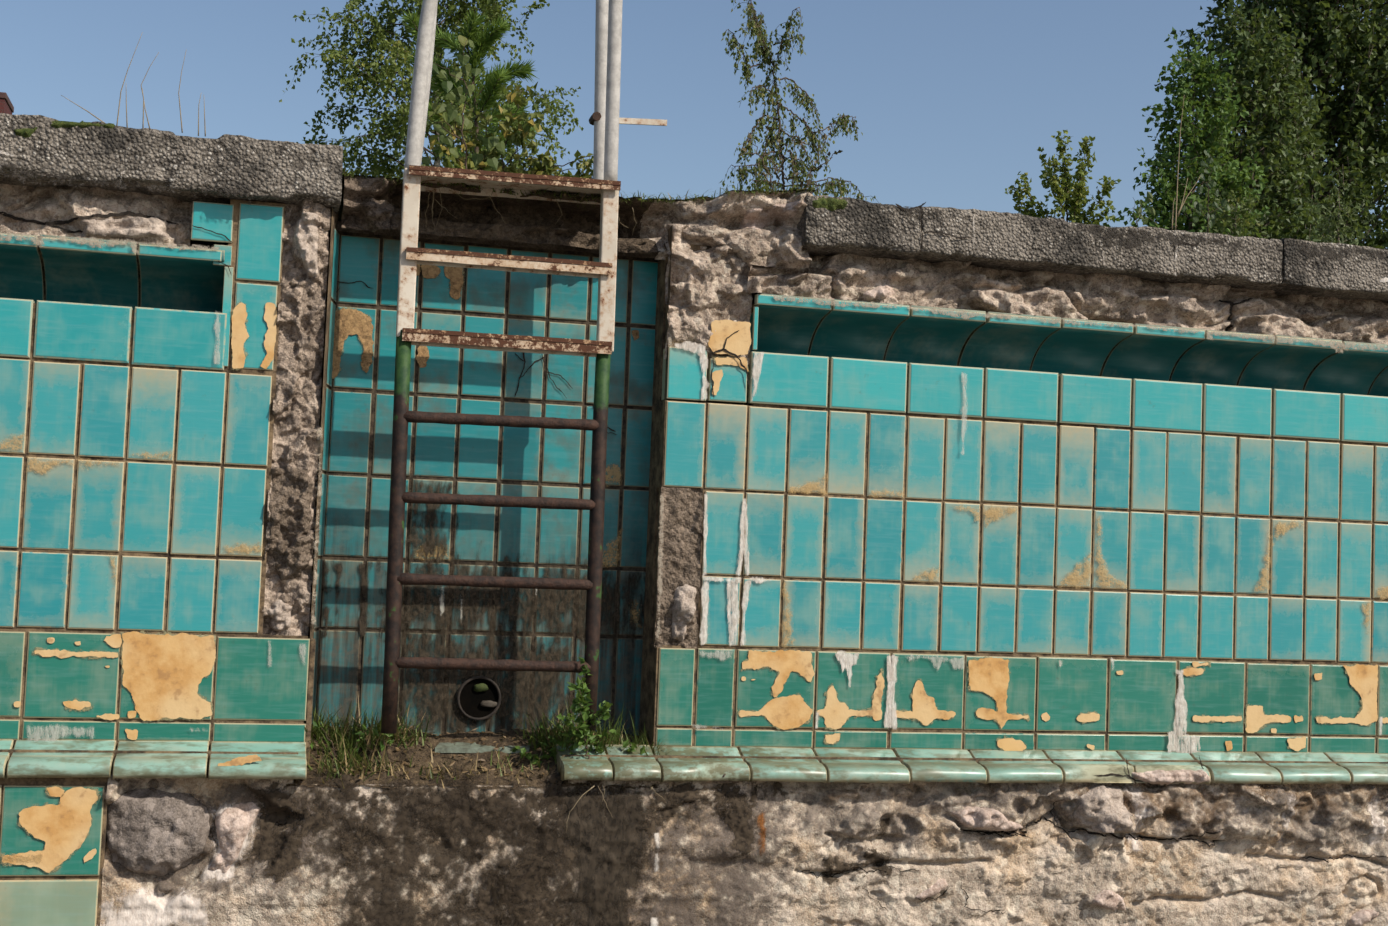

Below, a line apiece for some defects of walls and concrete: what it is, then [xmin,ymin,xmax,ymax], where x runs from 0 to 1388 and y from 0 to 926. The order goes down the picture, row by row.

crack [0,172,233,273]
peeling [231,302,277,370]
spalling [708,320,751,395]
crack [1219,298,1253,331]
leakage [300,427,664,734]
spalling [654,487,703,648]
peeling [32,630,216,740]
peeling [736,649,956,745]
peeling [967,656,1050,751]
peeling [1192,663,1388,751]
spalling [0,784,261,876]
leakage [101,778,325,926]